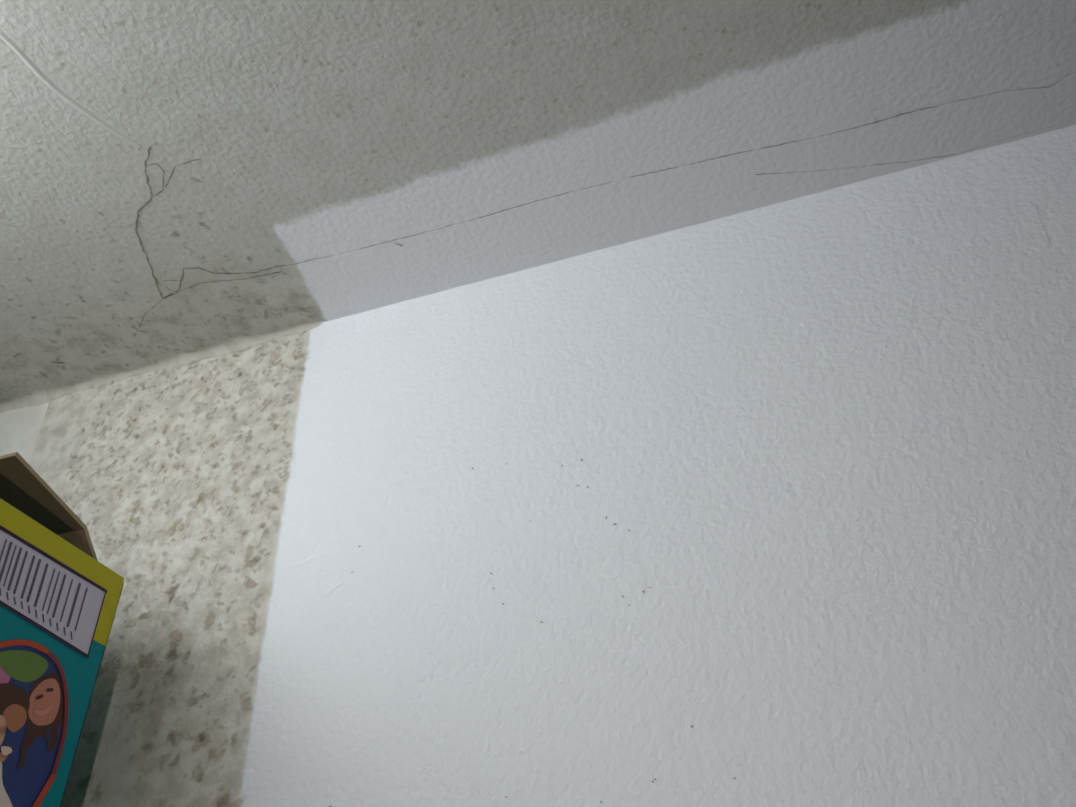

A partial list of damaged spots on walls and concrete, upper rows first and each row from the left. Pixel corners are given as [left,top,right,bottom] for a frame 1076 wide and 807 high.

crack [135,148,325,298]